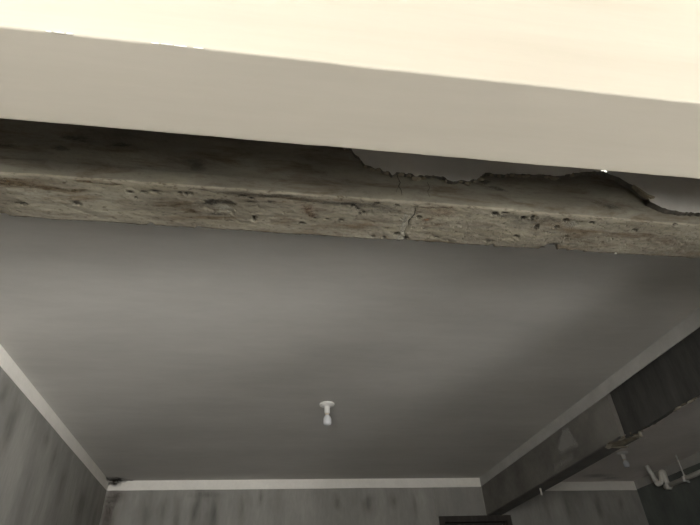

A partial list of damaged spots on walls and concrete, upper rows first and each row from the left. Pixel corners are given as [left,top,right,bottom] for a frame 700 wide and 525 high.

crack [398,207,417,239]
peeling [343,148,700,225]